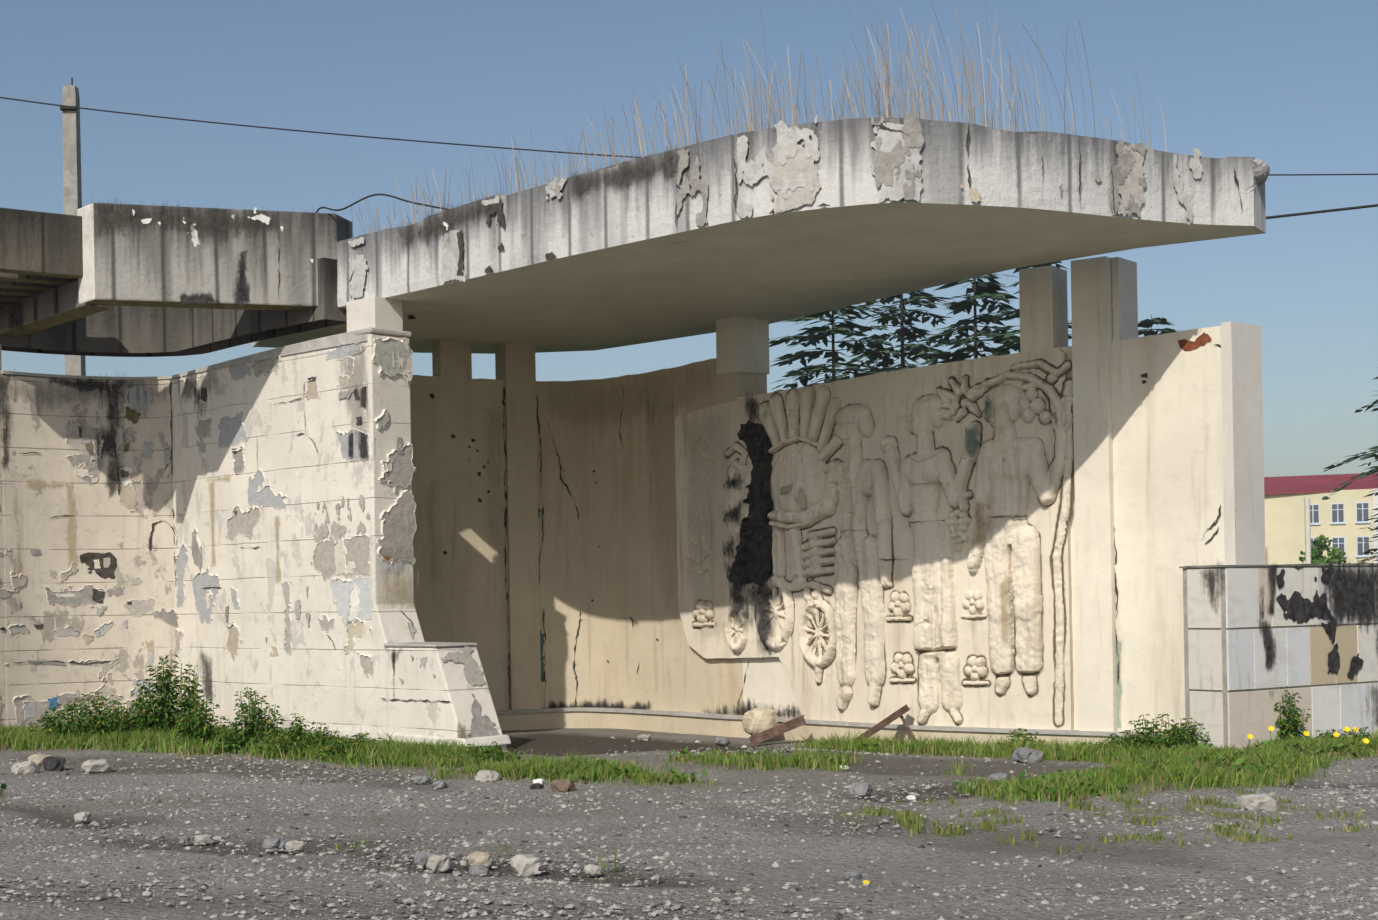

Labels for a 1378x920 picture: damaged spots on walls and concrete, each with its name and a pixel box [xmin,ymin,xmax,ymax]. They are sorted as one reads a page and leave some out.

water stain [98,204,283,247]
water stain [235,252,249,306]
spalling [734,115,830,218]
spalling [870,113,924,202]
water stain [52,378,123,494]
peeling [0,527,243,730]
peeling [177,376,287,541]
peeling [265,428,417,678]
peeling [410,646,500,738]
crack [502,388,581,709]
water stain [723,395,774,652]
water stain [1260,549,1378,679]